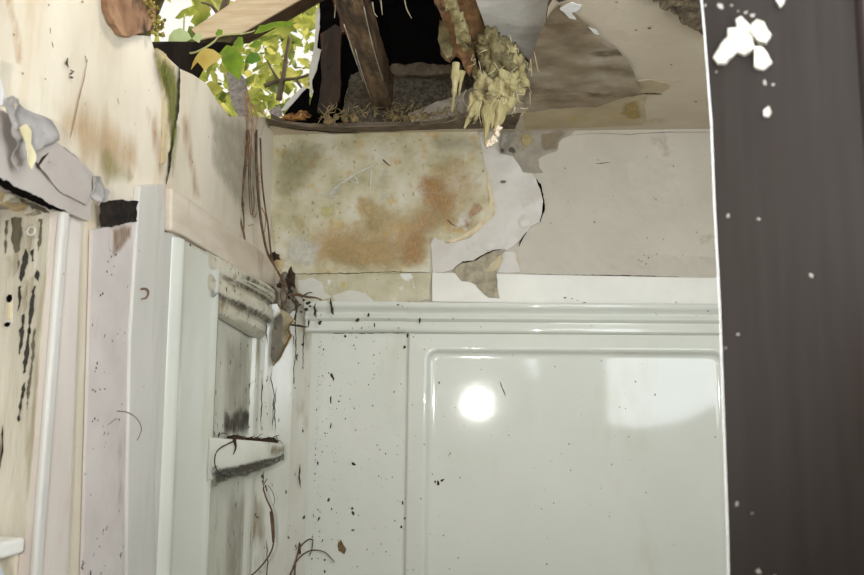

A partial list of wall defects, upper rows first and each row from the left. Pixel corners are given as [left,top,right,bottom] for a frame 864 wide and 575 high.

peeling [0,78,60,170]
crack [70,59,88,138]
leakage [266,79,670,133]
crack [0,178,66,212]
spalling [90,176,139,228]
flaking render [271,130,575,302]
peeling [0,191,50,422]